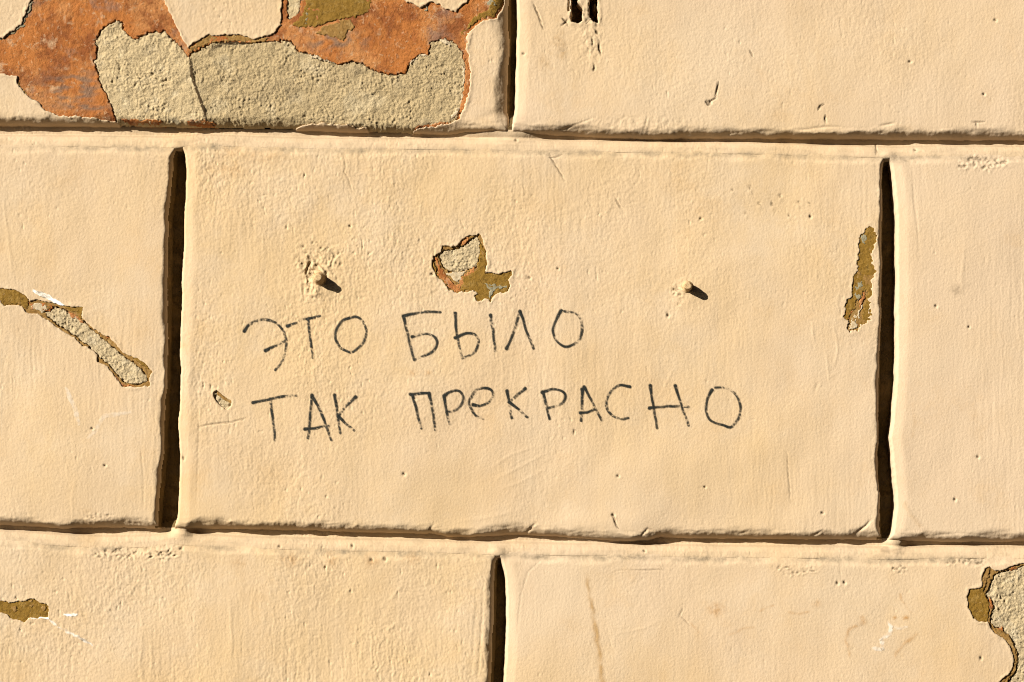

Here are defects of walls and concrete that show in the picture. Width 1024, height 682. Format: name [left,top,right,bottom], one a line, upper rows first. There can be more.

peeling [0,0,504,134]
peeling [432,234,512,302]
peeling [843,227,877,332]
peeling [0,288,152,387]
peeling [0,598,49,622]
peeling [967,563,1024,682]